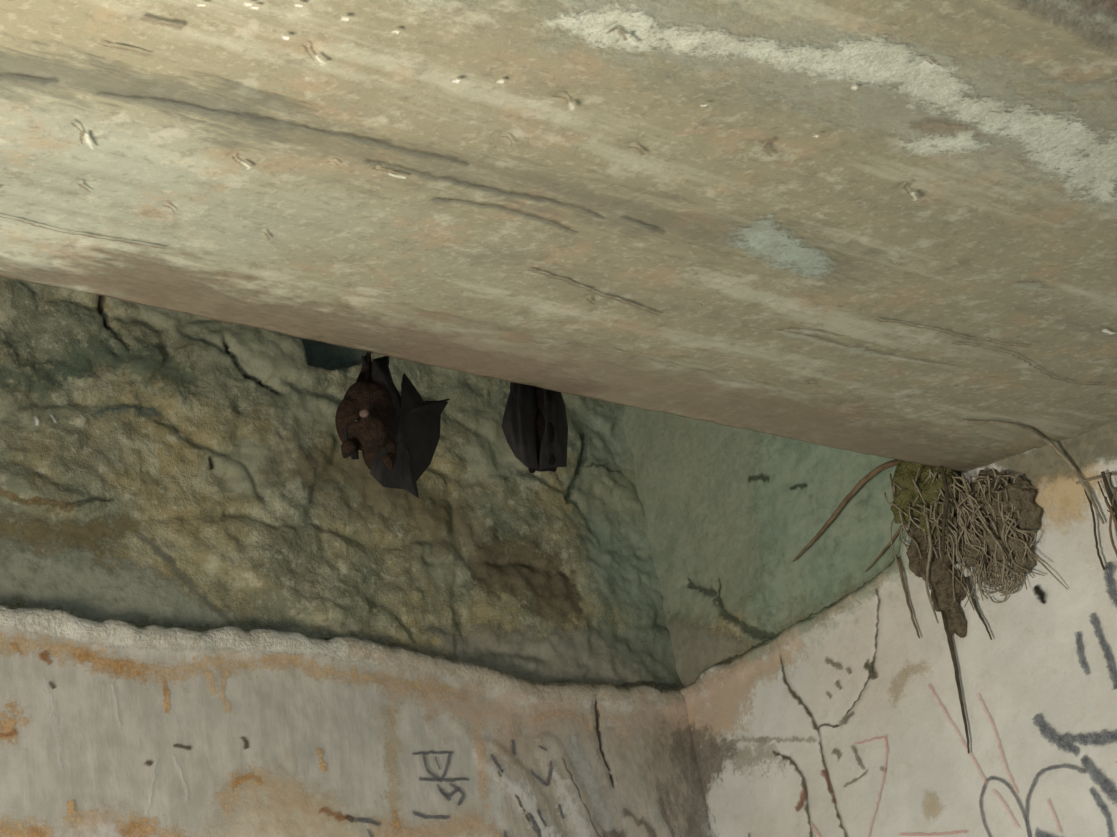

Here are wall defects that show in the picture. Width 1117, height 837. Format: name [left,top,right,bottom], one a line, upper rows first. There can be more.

crack [99,294,129,346]